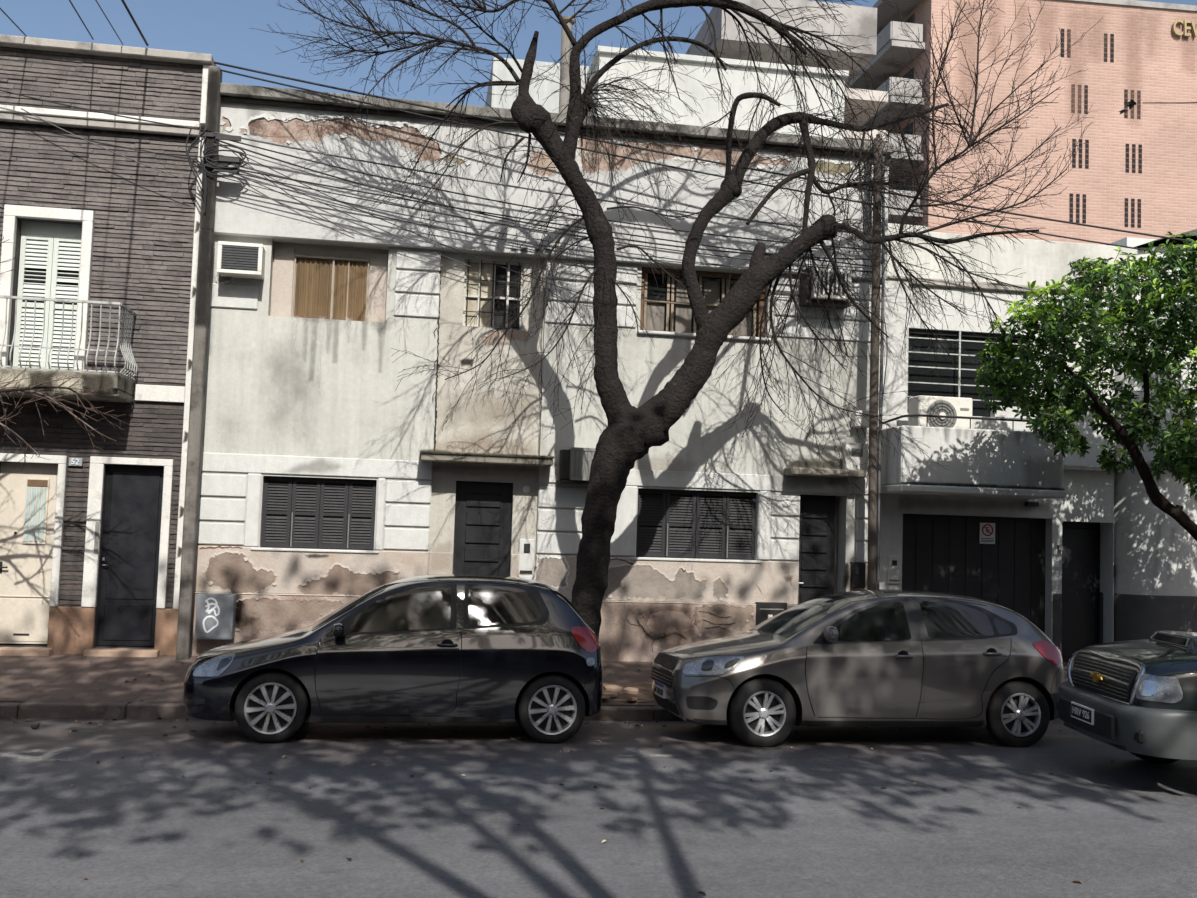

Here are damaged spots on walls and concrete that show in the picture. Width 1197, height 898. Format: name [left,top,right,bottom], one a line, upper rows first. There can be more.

flaking render [219,112,471,168]
flaking render [523,148,559,182]
flaking render [576,133,858,181]
spalling [202,550,401,636]
flaking render [533,555,570,589]
flaking render [603,563,756,640]